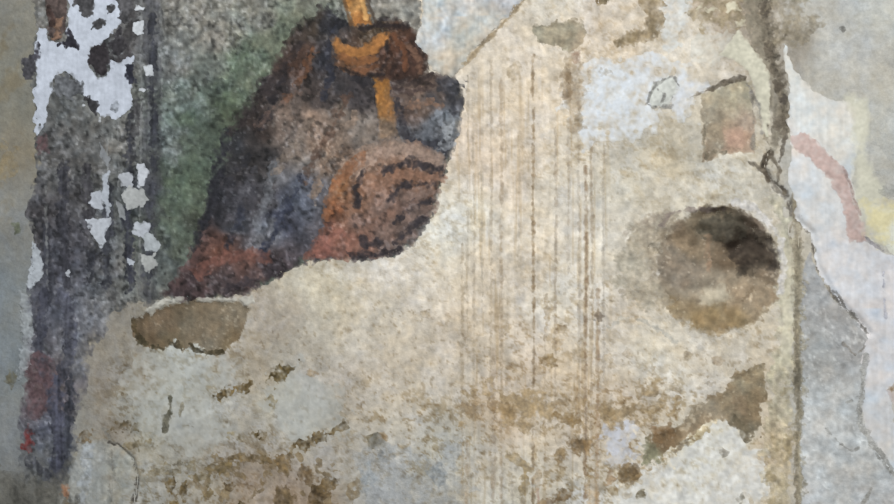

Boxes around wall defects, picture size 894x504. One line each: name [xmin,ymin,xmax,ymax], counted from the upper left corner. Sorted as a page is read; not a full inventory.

peeling [21,0,154,136]
peeling [85,142,161,274]
water stain [142,0,734,504]
flaking render [689,74,765,163]
crack [744,0,855,319]
flaking render [131,294,256,357]
crack [105,430,145,504]
water stain [106,420,158,452]